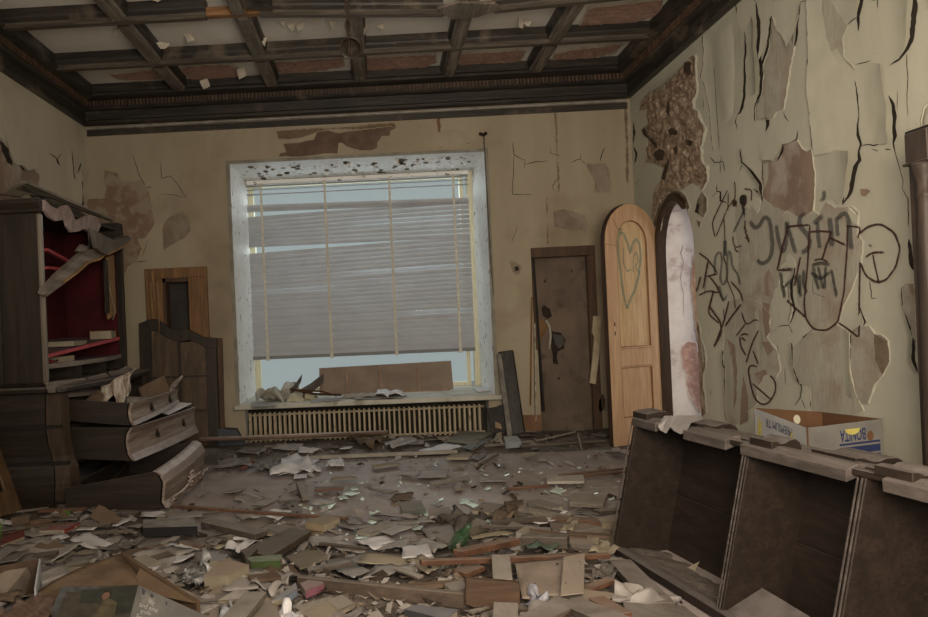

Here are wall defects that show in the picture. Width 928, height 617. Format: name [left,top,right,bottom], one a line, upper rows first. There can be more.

flaking render [0,97,40,199]
flaking render [87,170,192,277]
flaking render [246,126,471,180]
crack [512,147,604,195]
spalling [639,50,710,231]
flaking render [722,0,891,427]
crack [700,0,928,373]
spalling [680,255,708,418]
crack [777,262,826,407]